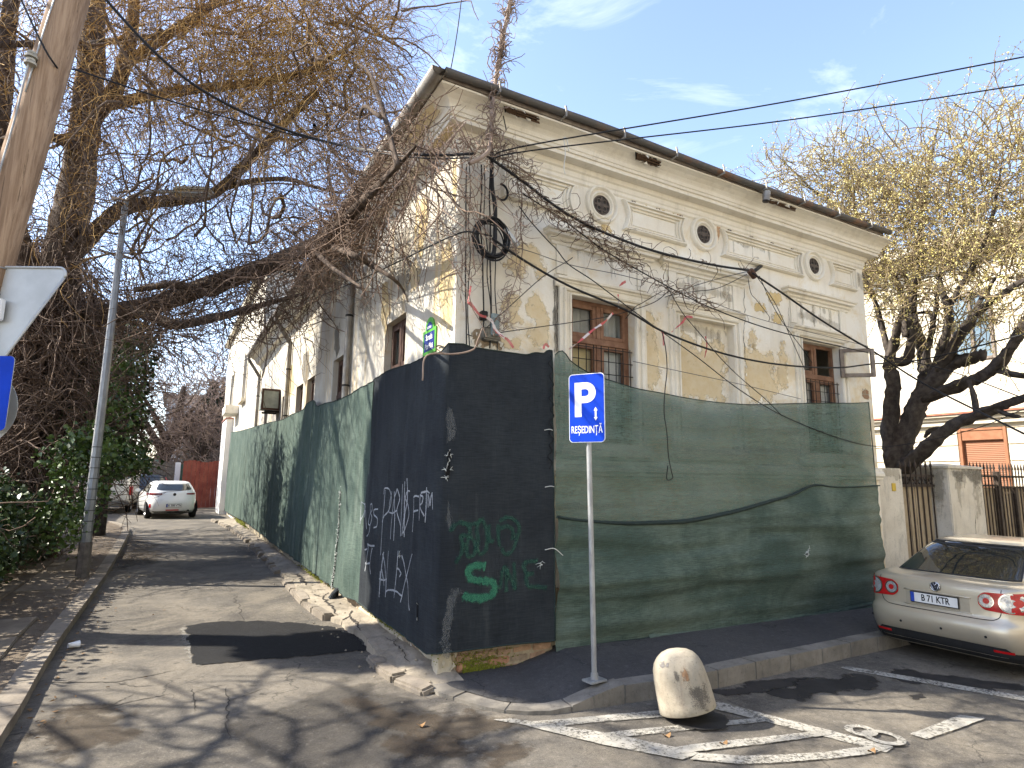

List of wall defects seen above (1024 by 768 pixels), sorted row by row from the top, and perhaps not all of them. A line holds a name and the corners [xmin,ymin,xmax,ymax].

peeling [472,244,550,351]
peeling [754,292,783,324]
peeling [646,311,661,390]
peeling [744,327,789,403]